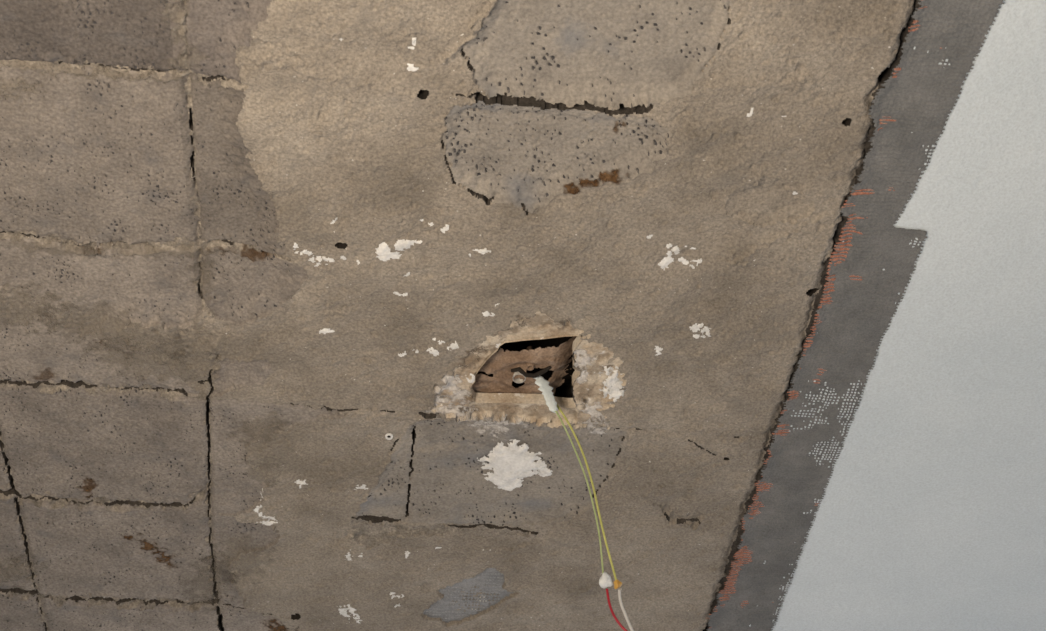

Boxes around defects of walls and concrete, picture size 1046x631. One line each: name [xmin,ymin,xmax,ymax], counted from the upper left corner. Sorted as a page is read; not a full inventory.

crack [456,49,654,116]
crack [188,108,196,181]
spalling [0,0,362,631]
crack [196,262,204,299]
peeling [375,239,422,261]
crack [0,354,272,631]
spalling [345,311,629,560]
crack [592,428,642,498]
crack [448,523,538,535]